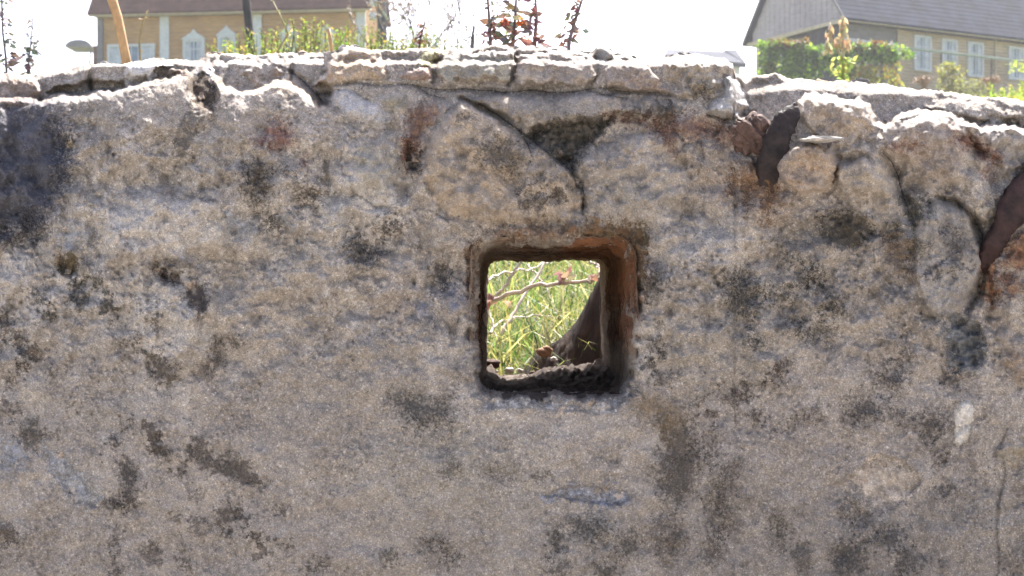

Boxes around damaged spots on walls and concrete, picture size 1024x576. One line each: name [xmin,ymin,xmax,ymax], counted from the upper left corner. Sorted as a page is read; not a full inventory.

leakage [0,99,101,258]
crack [356,82,660,210]
corrosion [464,245,486,357]
corrosion [487,216,653,347]
leakage [939,369,974,391]
leakage [541,346,952,576]